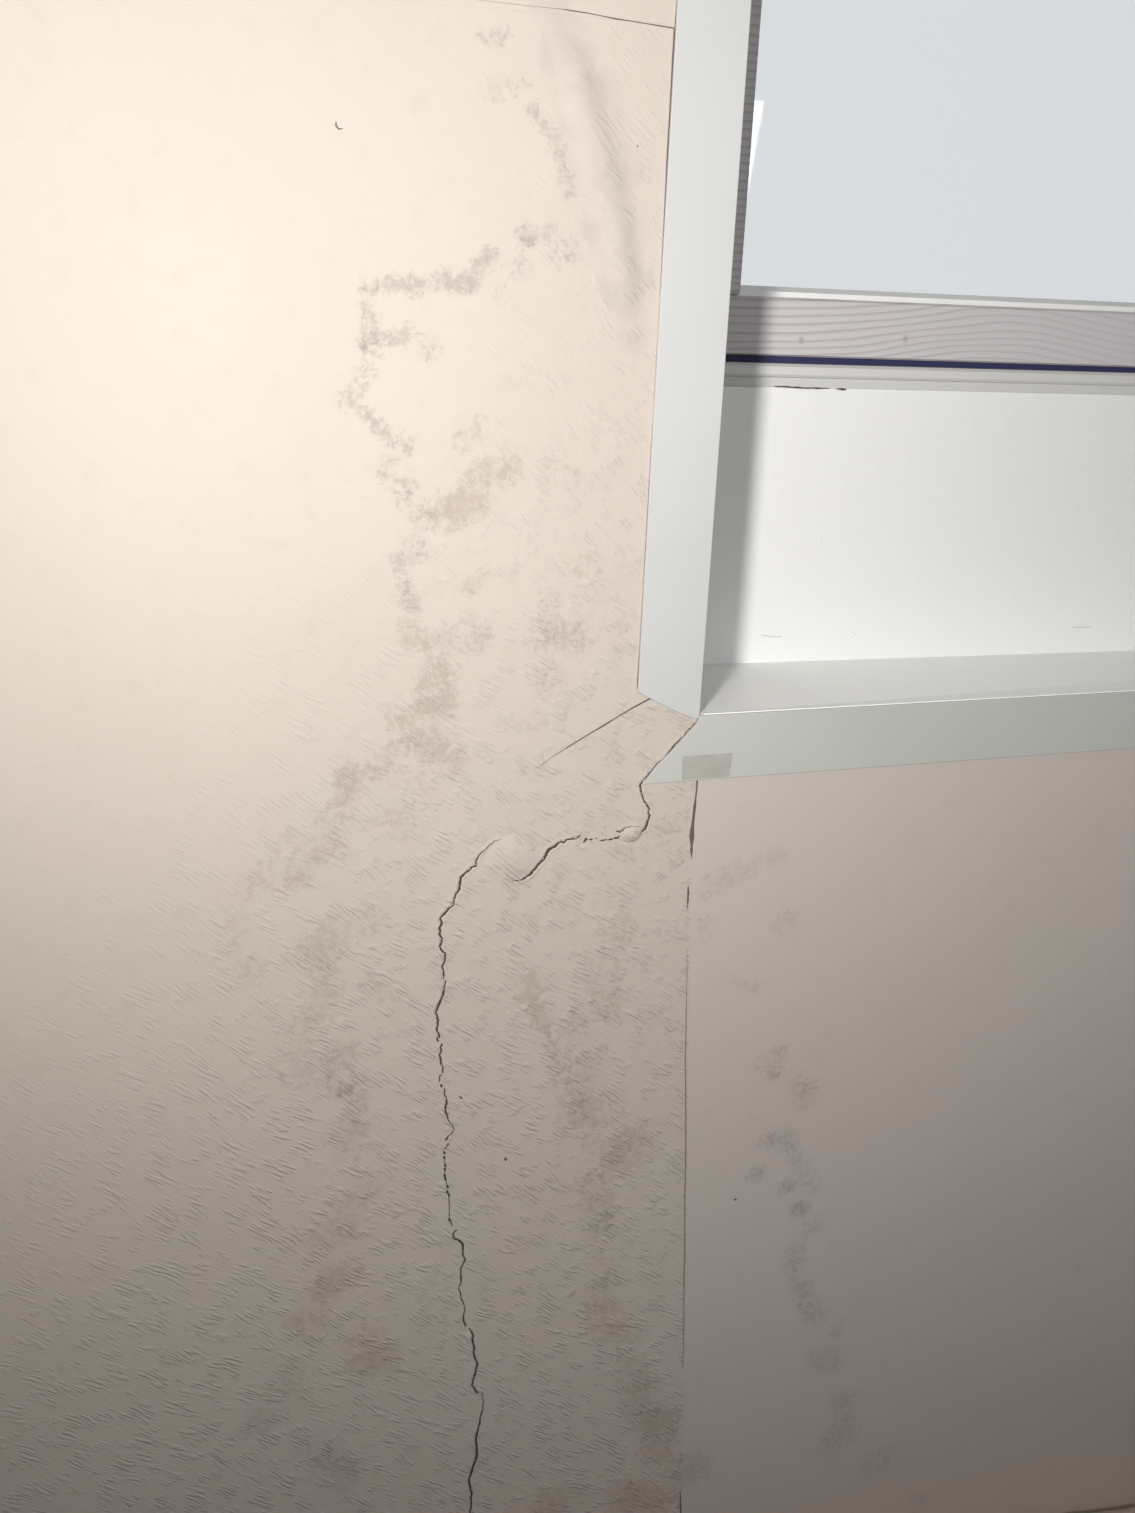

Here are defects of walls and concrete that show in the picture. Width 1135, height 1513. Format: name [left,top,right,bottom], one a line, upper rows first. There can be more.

crack [482,0,674,29]
crack [535,698,650,769]
crack [431,712,704,1513]